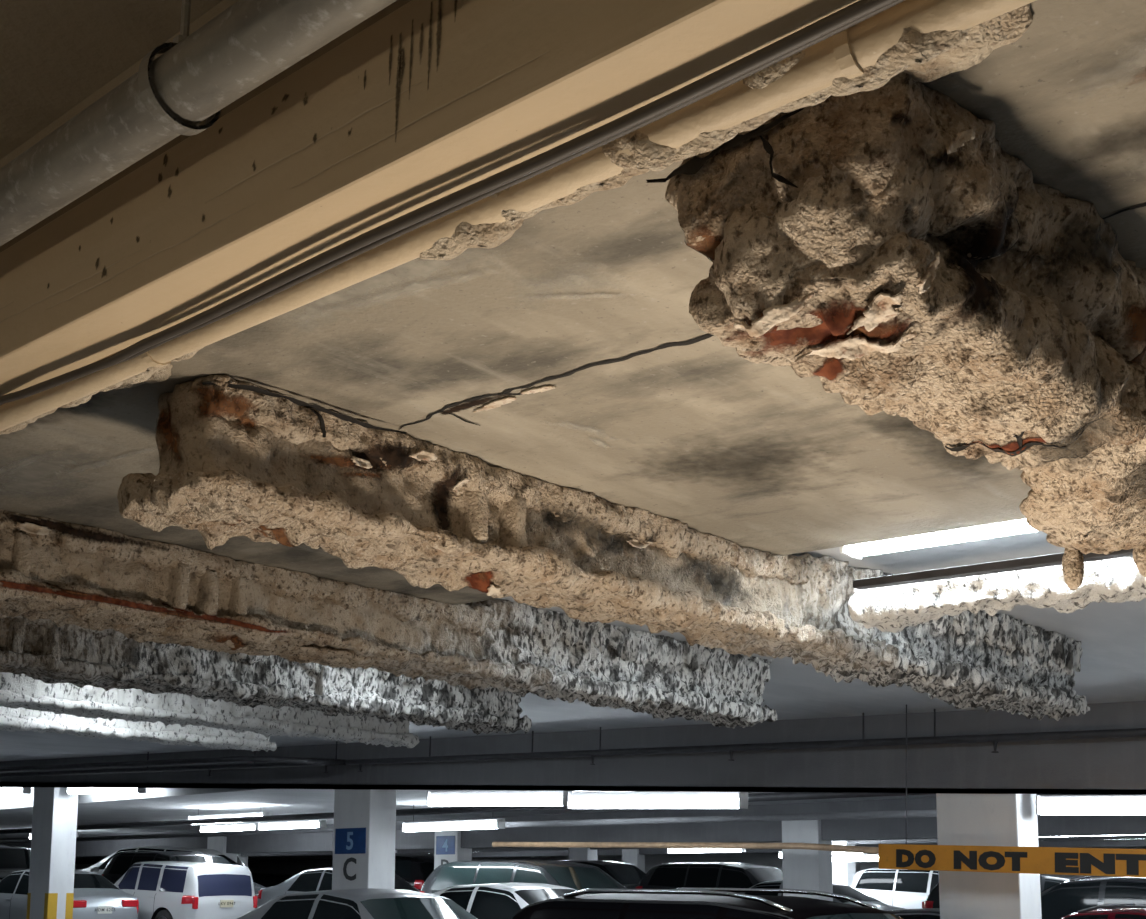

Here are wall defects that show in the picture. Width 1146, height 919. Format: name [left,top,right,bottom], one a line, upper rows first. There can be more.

spalling [931,129,975,168]
spalling [915,194,1020,333]
rust [733,292,917,381]
crack [202,334,714,438]
spalling [351,445,438,471]
spalling [431,464,470,540]
spalling [543,507,653,553]
spalling [684,558,749,596]
rust [0,580,289,651]